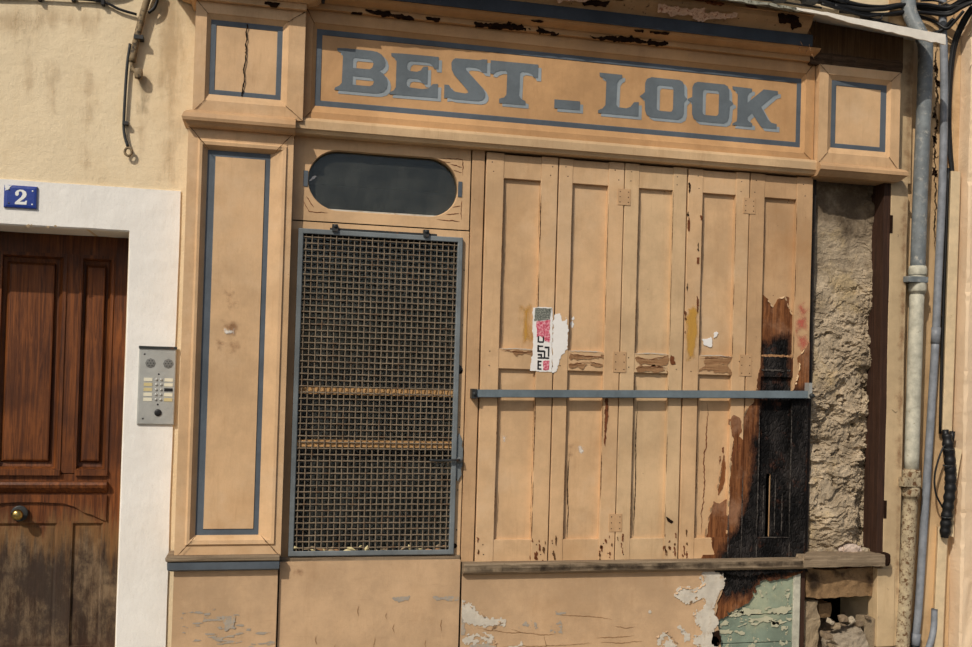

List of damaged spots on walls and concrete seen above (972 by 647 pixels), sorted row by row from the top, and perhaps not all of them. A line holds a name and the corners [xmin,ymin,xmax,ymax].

spalling [351,9,414,21]
spalling [474,20,559,36]
peeling [658,0,757,22]
spalling [778,13,802,30]
spalling [590,30,669,47]
crack [240,24,248,96]
peeling [569,350,604,370]
peeling [635,353,675,373]
peeling [699,355,732,375]
peeling [695,405,713,538]
peeling [656,571,793,647]
peeling [432,596,506,647]